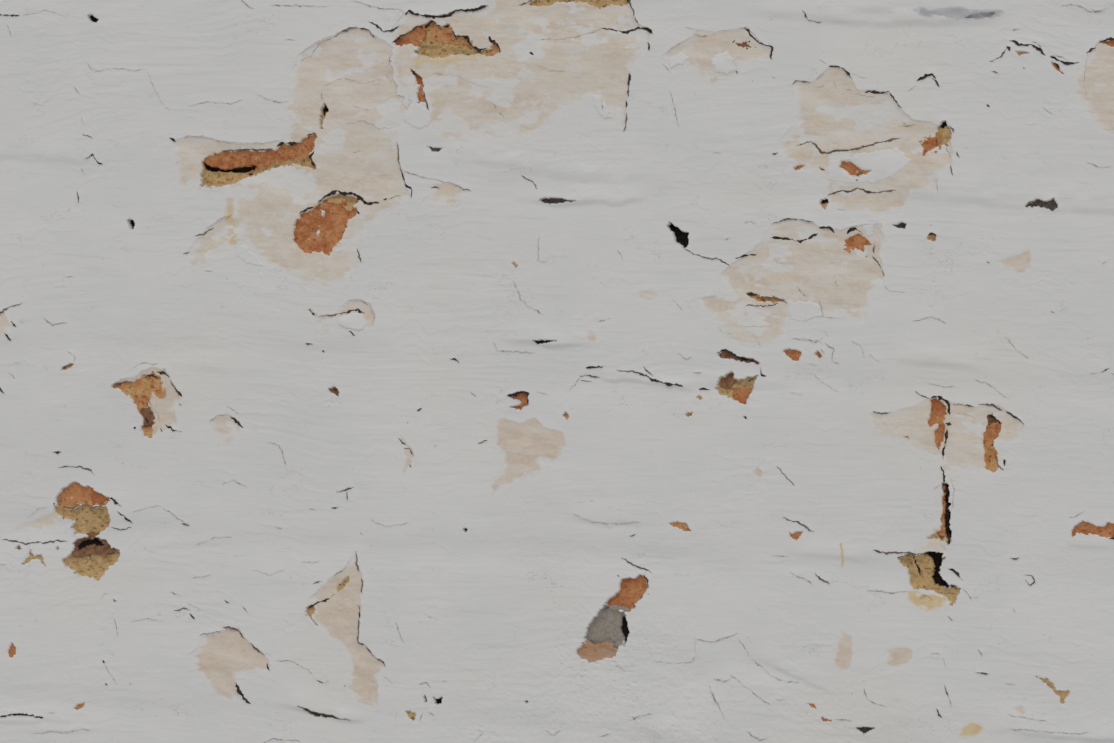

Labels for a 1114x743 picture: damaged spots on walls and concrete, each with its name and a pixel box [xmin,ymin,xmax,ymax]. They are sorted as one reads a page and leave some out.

peeling [662,27,773,90]
peeling [170,0,652,288]
peeling [698,60,960,404]
flaking render [112,362,182,439]
peeling [478,391,569,498]
flaking render [53,482,131,581]
peeling [867,379,1024,619]
crack [938,466,955,543]
flaking render [1069,511,1114,539]
peeling [189,626,270,704]
peeling [307,554,385,710]
flaking render [577,558,651,663]